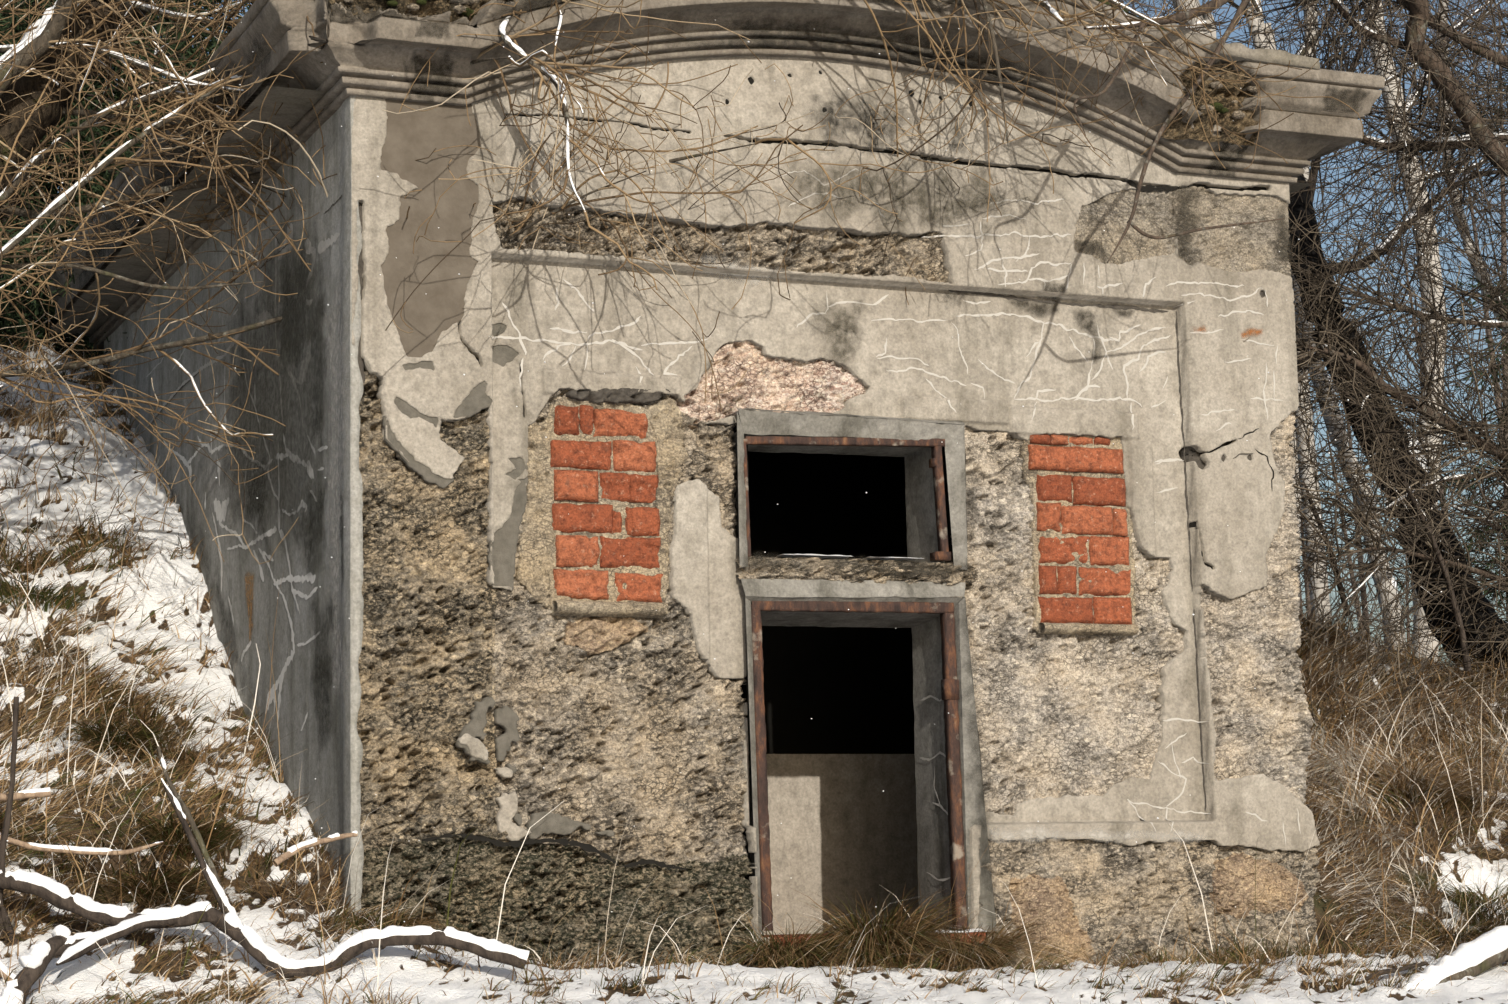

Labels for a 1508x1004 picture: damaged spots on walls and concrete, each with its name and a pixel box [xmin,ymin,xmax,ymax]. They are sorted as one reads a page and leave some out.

crack [121,309,328,731]
water stain [204,212,348,733]
crack [468,279,707,417]
spalling [357,341,867,968]
peeling [380,99,949,371]
crack [737,138,1301,844]
spalling [950,426,1184,815]
spalling [1074,186,1291,276]
spalling [1200,412,1313,804]
spalling [979,837,1320,970]